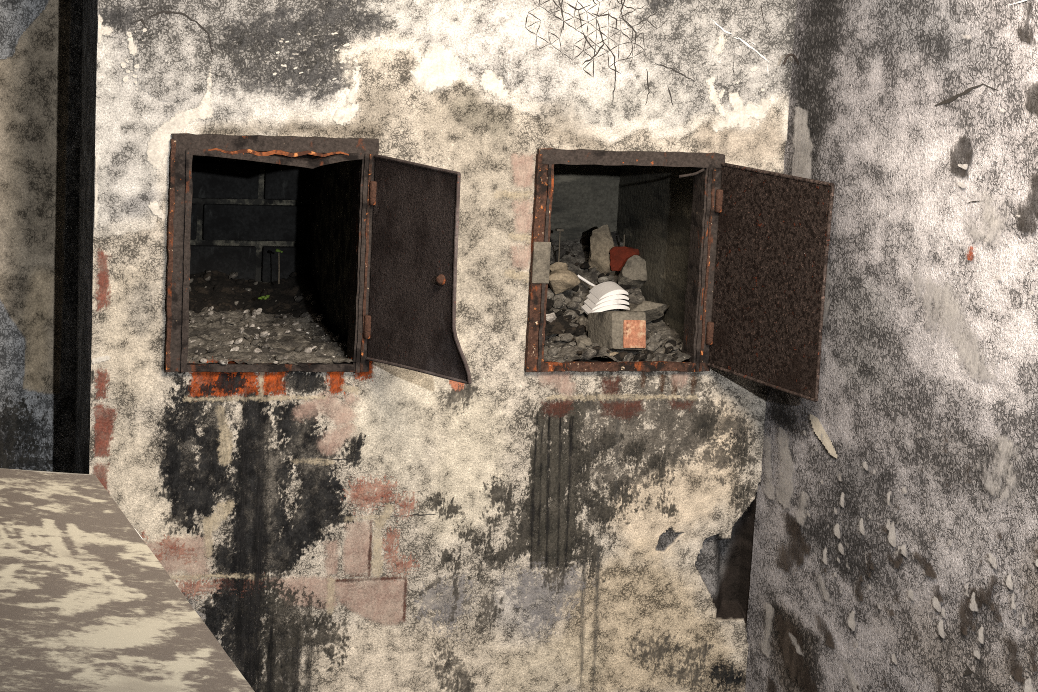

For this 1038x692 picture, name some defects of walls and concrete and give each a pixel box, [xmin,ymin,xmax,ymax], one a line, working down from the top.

spalling [98,15,113,43]
crack [525,0,694,107]
water stain [1017,2,1036,44]
spalling [0,0,76,399]
peeling [147,67,213,169]
corrosion [208,148,349,157]
water stain [947,136,973,177]
water stain [963,173,1038,245]
flaking render [91,355,117,494]
corrosion [174,360,373,403]
water stain [414,368,764,692]
spalling [692,427,820,692]